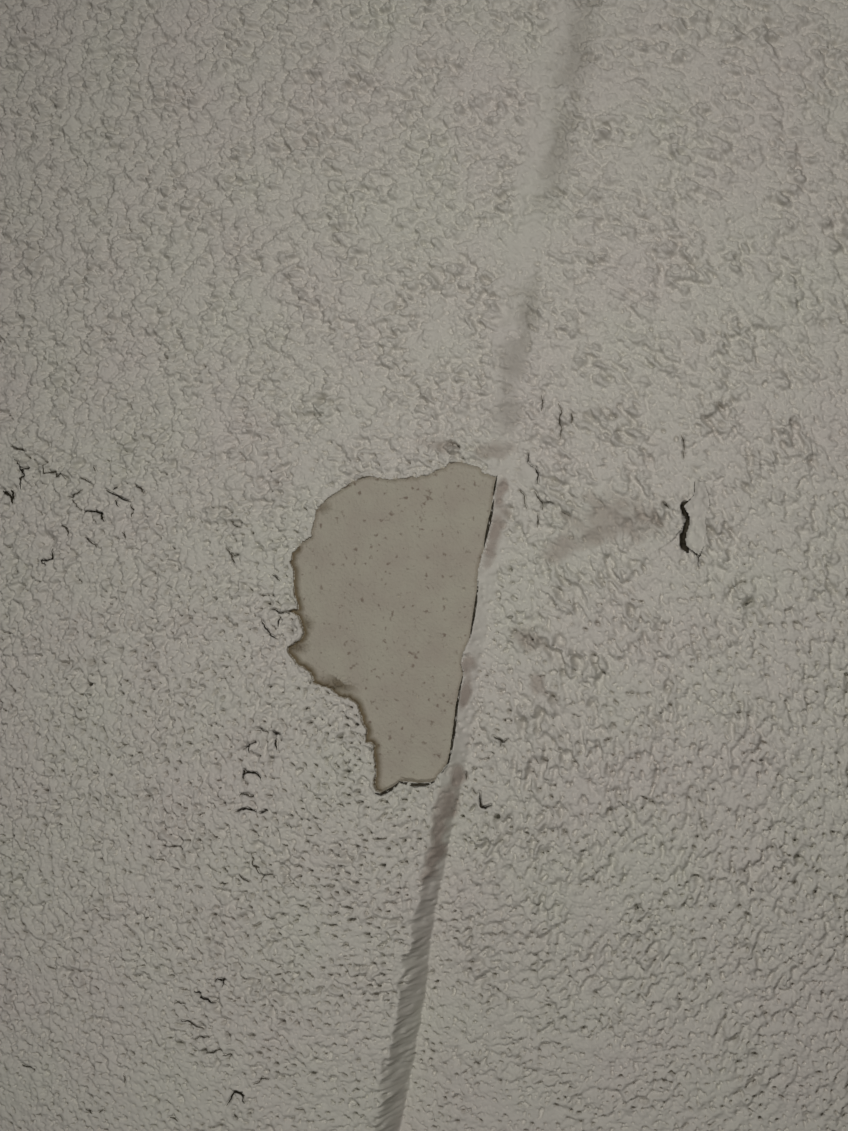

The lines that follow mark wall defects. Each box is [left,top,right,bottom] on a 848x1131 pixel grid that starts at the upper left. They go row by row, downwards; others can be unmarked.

peeling [284,459,500,796]